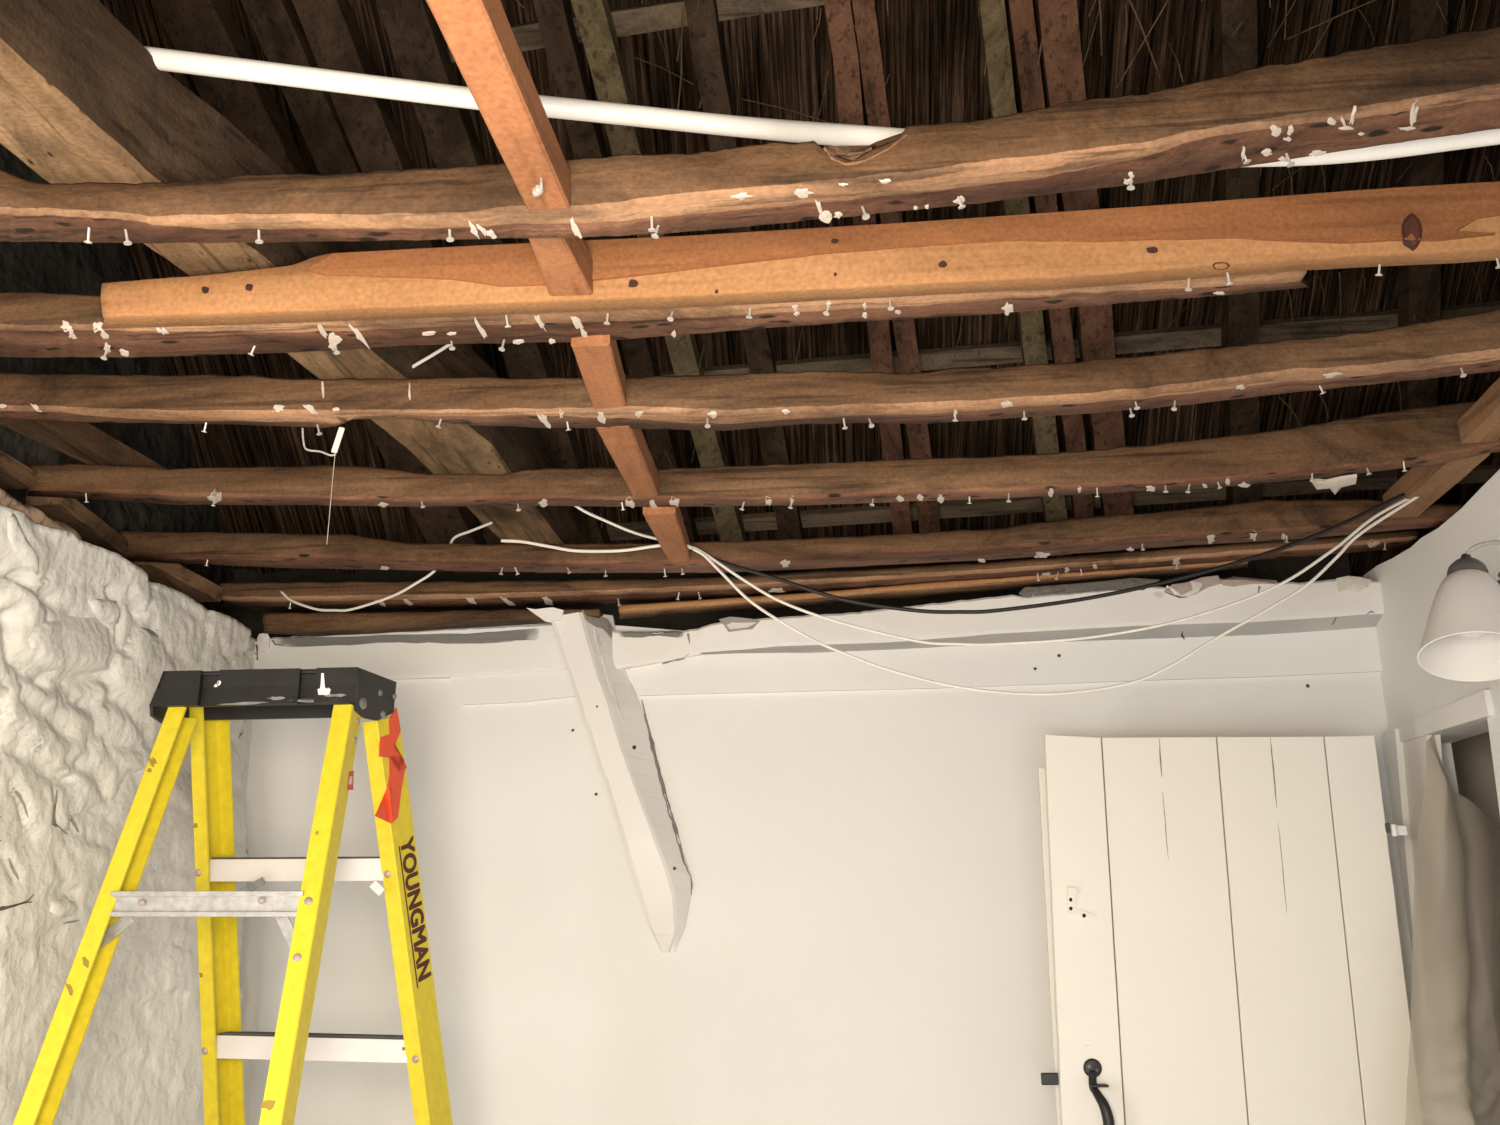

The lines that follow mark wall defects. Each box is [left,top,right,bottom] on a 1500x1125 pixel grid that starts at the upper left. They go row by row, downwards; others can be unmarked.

crack [0,788,79,911]